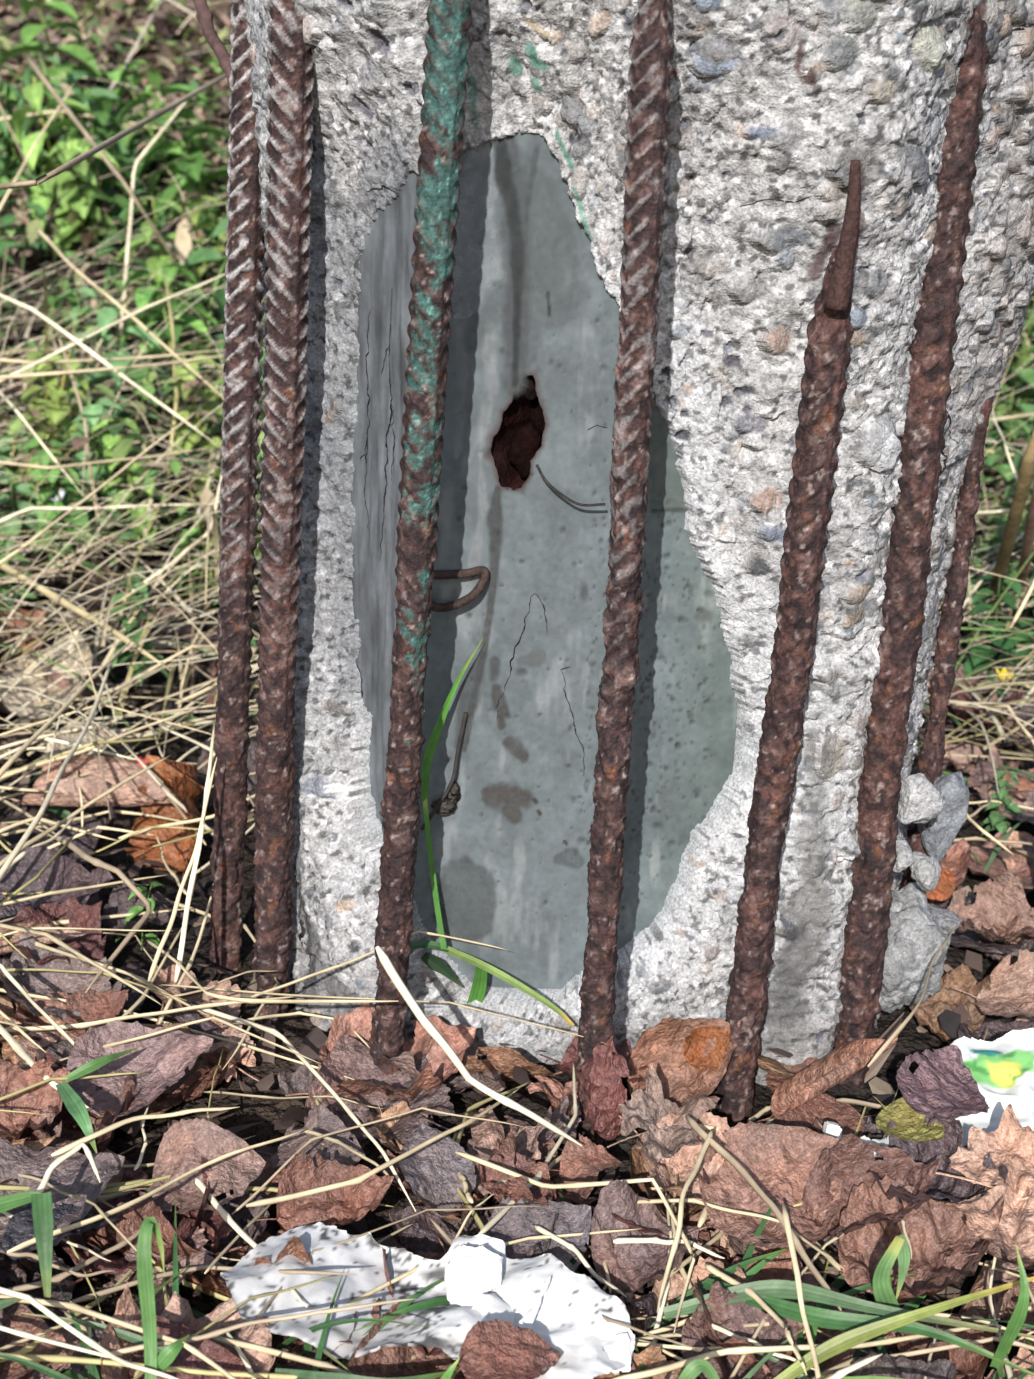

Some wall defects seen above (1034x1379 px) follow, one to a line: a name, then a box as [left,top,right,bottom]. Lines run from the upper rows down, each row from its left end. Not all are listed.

corrosion [967,0,987,45]
corrosion [809,226,841,279]
spalling [343,0,738,1145]
crack [496,593,547,717]